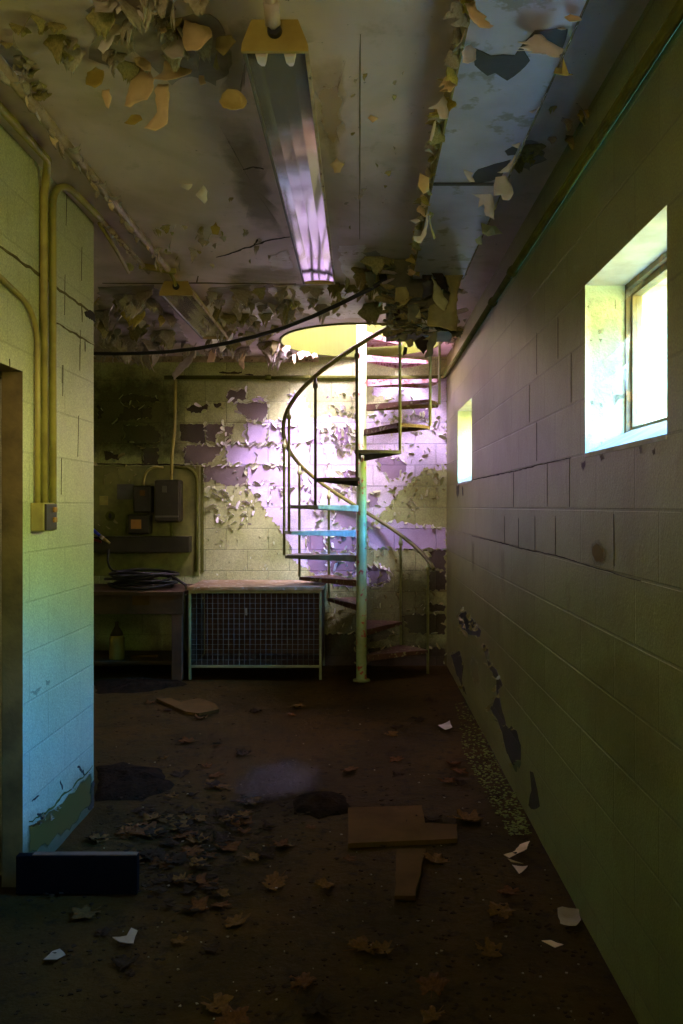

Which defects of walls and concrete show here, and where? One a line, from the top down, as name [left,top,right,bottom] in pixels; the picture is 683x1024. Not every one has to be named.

peeling [0,0,247,160]
crack [189,237,294,285]
peeling [90,0,589,380]
peeling [178,377,540,809]
peeling [29,765,93,826]